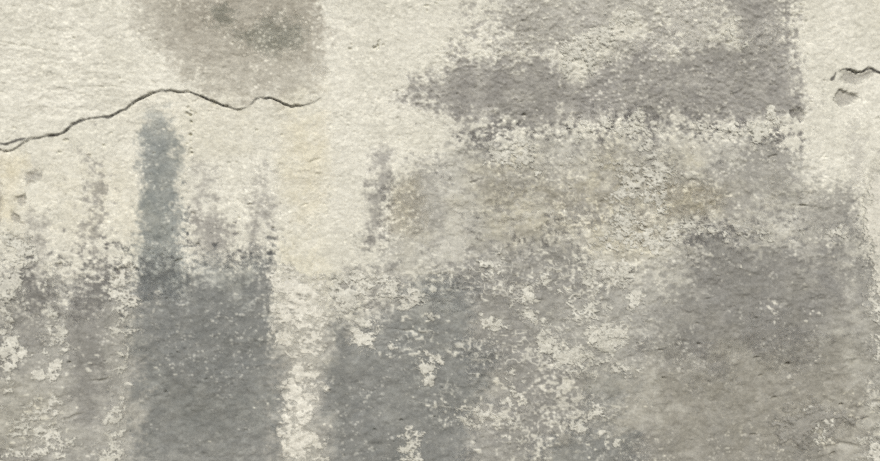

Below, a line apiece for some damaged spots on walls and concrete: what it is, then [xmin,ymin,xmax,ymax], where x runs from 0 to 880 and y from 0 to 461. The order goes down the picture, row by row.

crack [830,68,880,81]
crack [0,101,136,145]